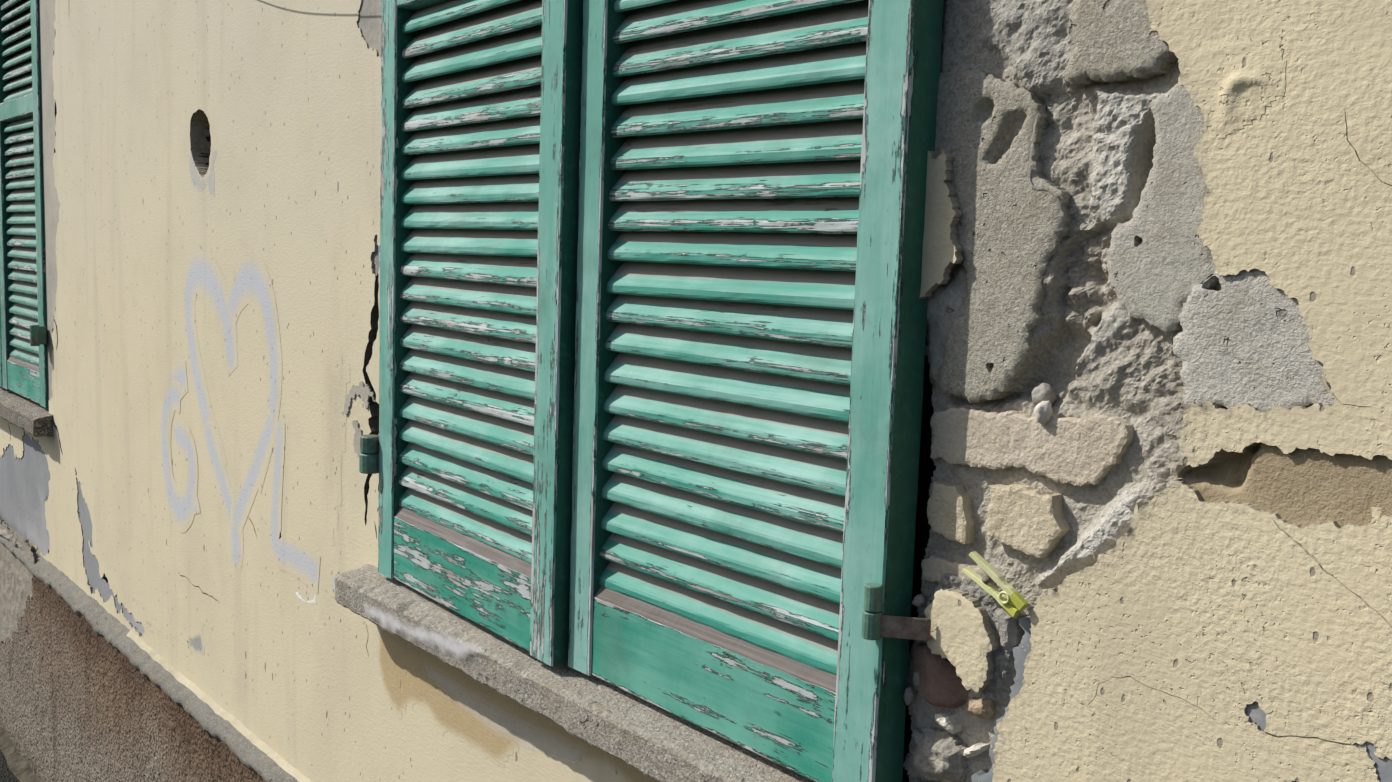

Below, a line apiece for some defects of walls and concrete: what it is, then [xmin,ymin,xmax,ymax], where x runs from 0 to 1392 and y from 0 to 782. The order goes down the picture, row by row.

crack [1345,113,1392,186]
crack [363,273,379,435]
flaking render [903,0,1392,782]
peeling [0,434,50,643]
peeling [76,474,145,634]
crack [364,474,379,538]